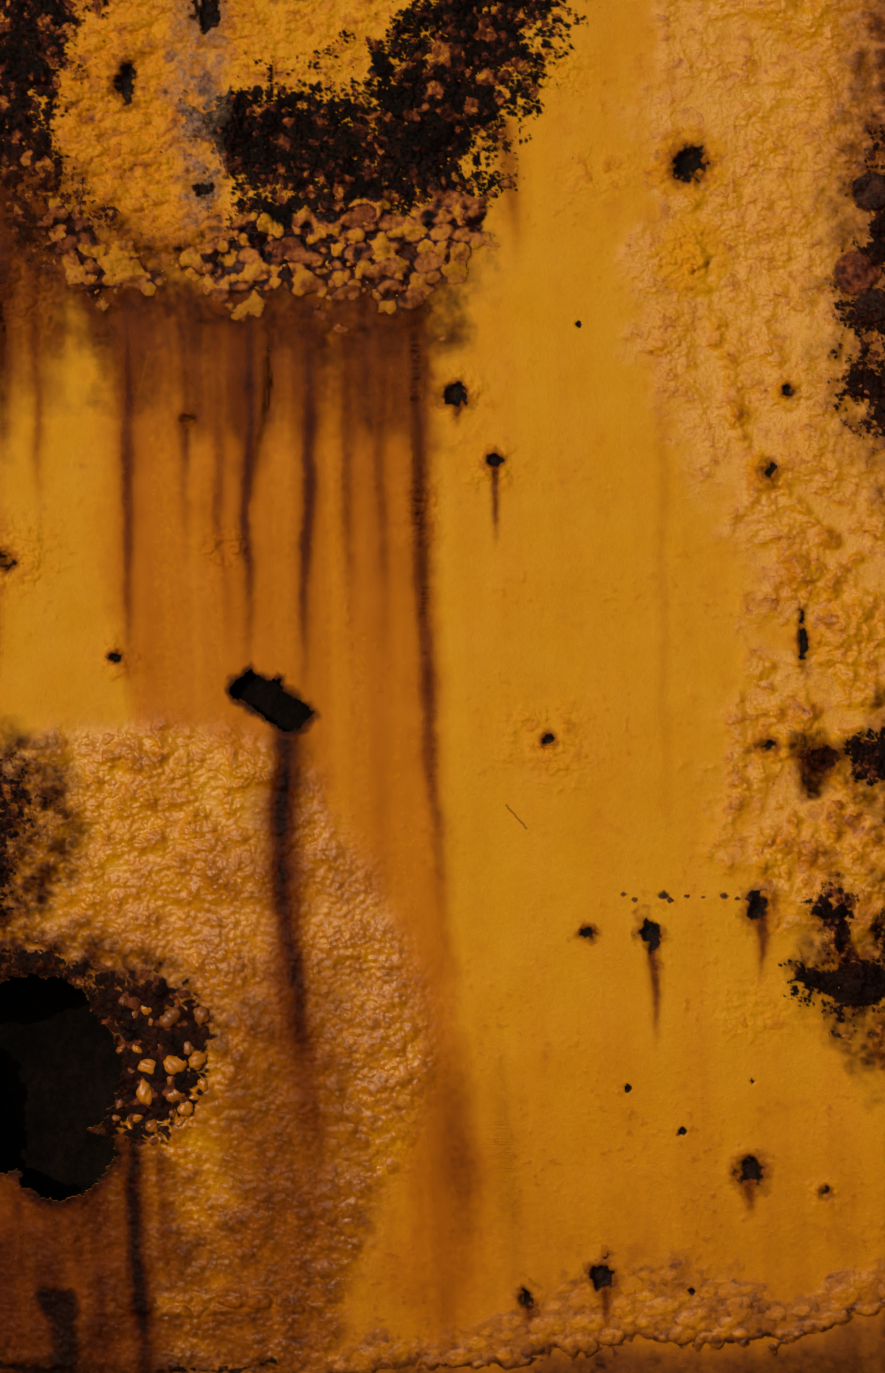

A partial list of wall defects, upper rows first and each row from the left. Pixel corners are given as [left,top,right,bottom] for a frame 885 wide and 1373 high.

corrosion [178,0,588,232]
corrosion [843,56,885,196]
corrosion [841,207,885,288]
corrosion [826,281,885,451]
corrosion [0,0,478,1373]
corrosion [842,726,885,799]
corrosion [778,873,885,1040]
spalling [505,1280,548,1324]
spalling [565,1239,638,1320]